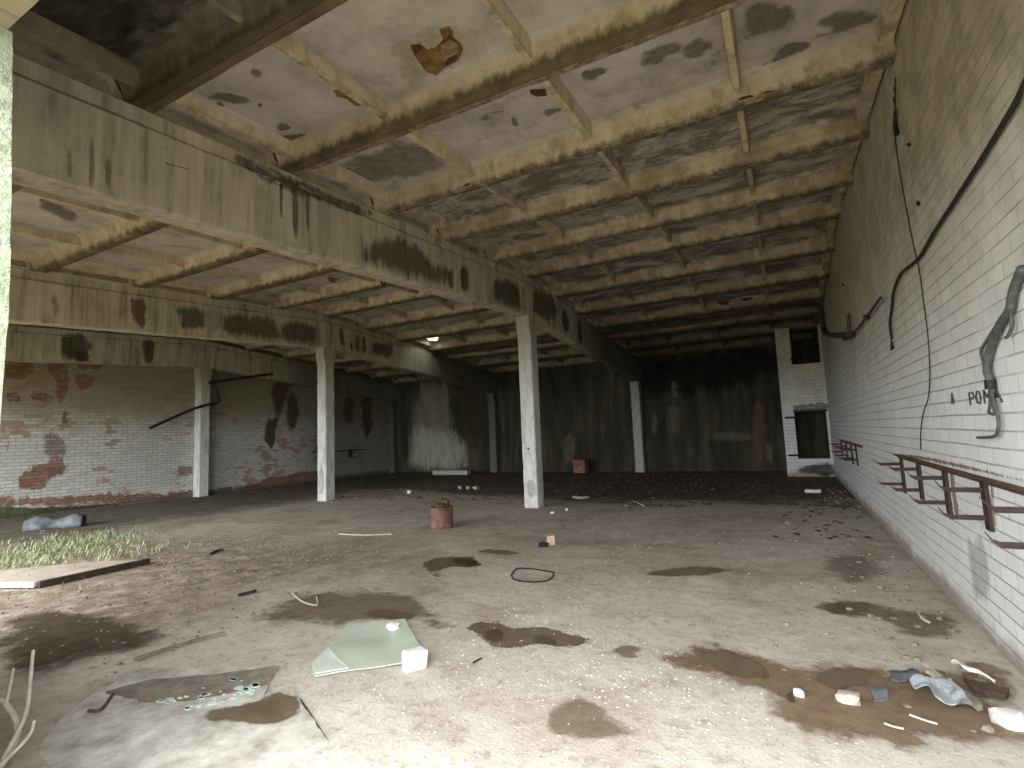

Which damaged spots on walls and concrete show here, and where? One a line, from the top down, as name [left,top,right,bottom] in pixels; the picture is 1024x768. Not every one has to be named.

spalling [410,26,463,76]
damp [643,39,711,65]
damp [346,144,436,181]
damp [236,156,371,237]
damp [365,236,469,291]
damp [62,334,92,361]
damp [224,313,317,342]
flaking render [5,362,102,423]
damp [410,380,488,470]
flaking render [0,433,193,508]
flaking render [225,470,318,490]
corrosion [901,454,1022,526]